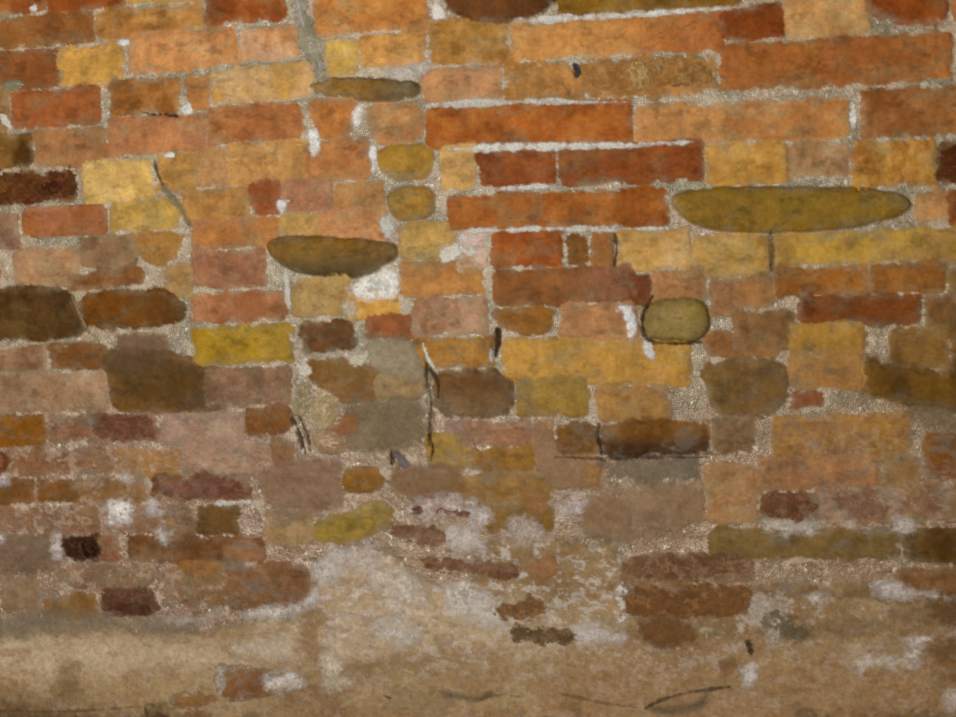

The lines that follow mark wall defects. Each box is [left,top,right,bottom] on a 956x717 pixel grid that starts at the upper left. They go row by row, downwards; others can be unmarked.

crack [154,163,190,226]
crack [291,416,310,447]
crack [425,363,440,457]
efflorescence [407,494,489,551]
water stain [772,522,813,536]
efflorescence [248,541,426,618]
efflorescence [444,581,507,630]
efflorescence [574,582,628,643]
efflorescence [870,581,938,601]
efflorescence [265,673,302,693]
water stain [741,662,757,685]
efflorescence [852,636,930,673]